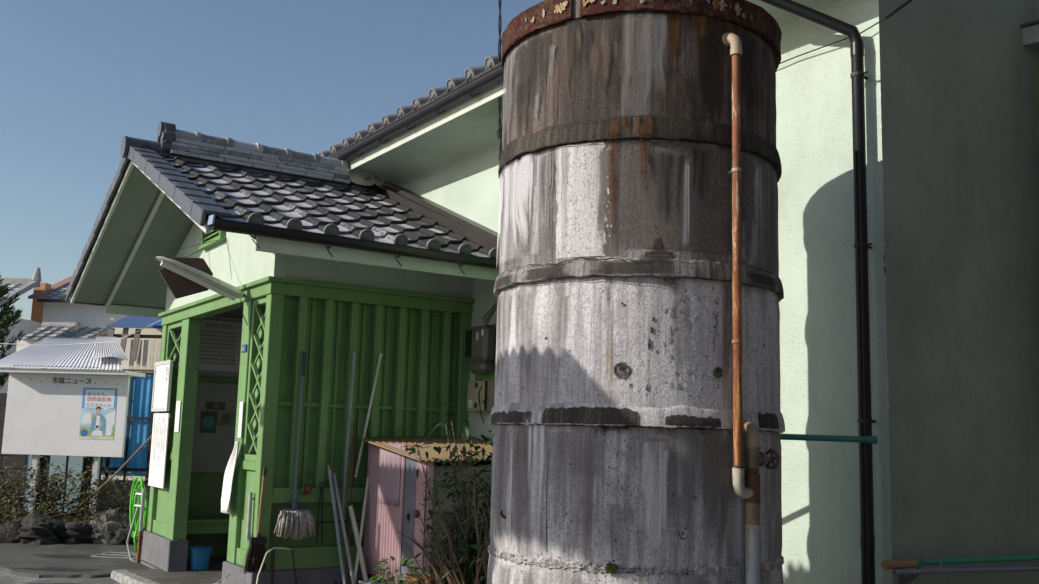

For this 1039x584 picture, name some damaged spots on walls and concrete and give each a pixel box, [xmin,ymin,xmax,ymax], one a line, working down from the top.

leakage [502,14,687,144]
leakage [497,155,539,253]
corrosion [609,112,652,243]
leakage [595,142,758,320]
leakage [494,263,563,361]
leakage [526,410,544,539]
leakage [643,443,667,545]